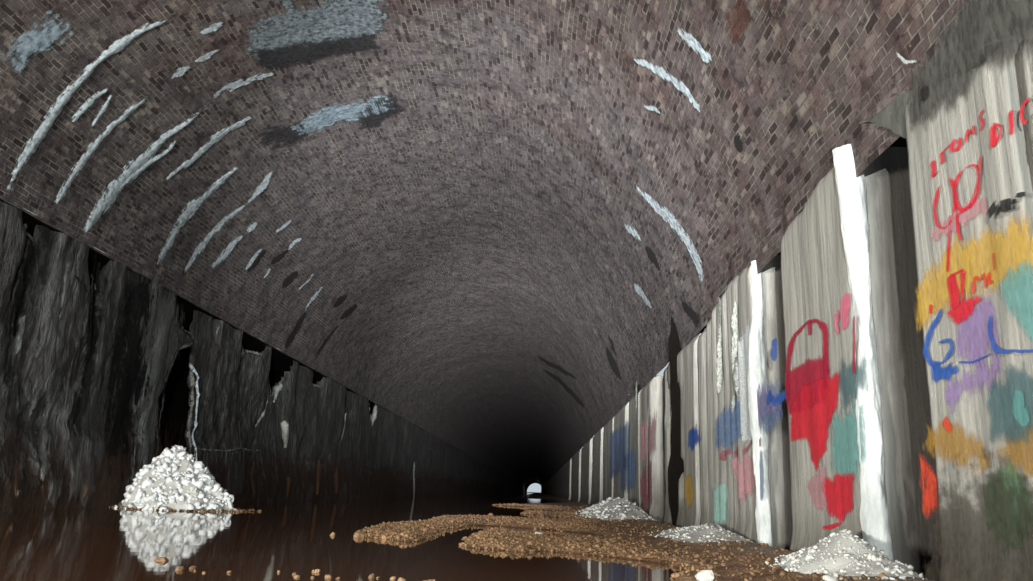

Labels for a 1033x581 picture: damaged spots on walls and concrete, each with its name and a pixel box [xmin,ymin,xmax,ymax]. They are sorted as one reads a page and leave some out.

leakage [7,11,73,72]
leakage [6,21,166,204]
leakage [84,112,199,233]
leakage [157,168,238,264]
leakage [167,116,251,180]
leakage [185,172,272,272]
leakage [214,0,388,98]
leakage [291,96,389,135]
leakage [634,59,700,112]
leakage [636,186,703,281]
leakage [678,28,711,63]
leakage [125,278,184,483]